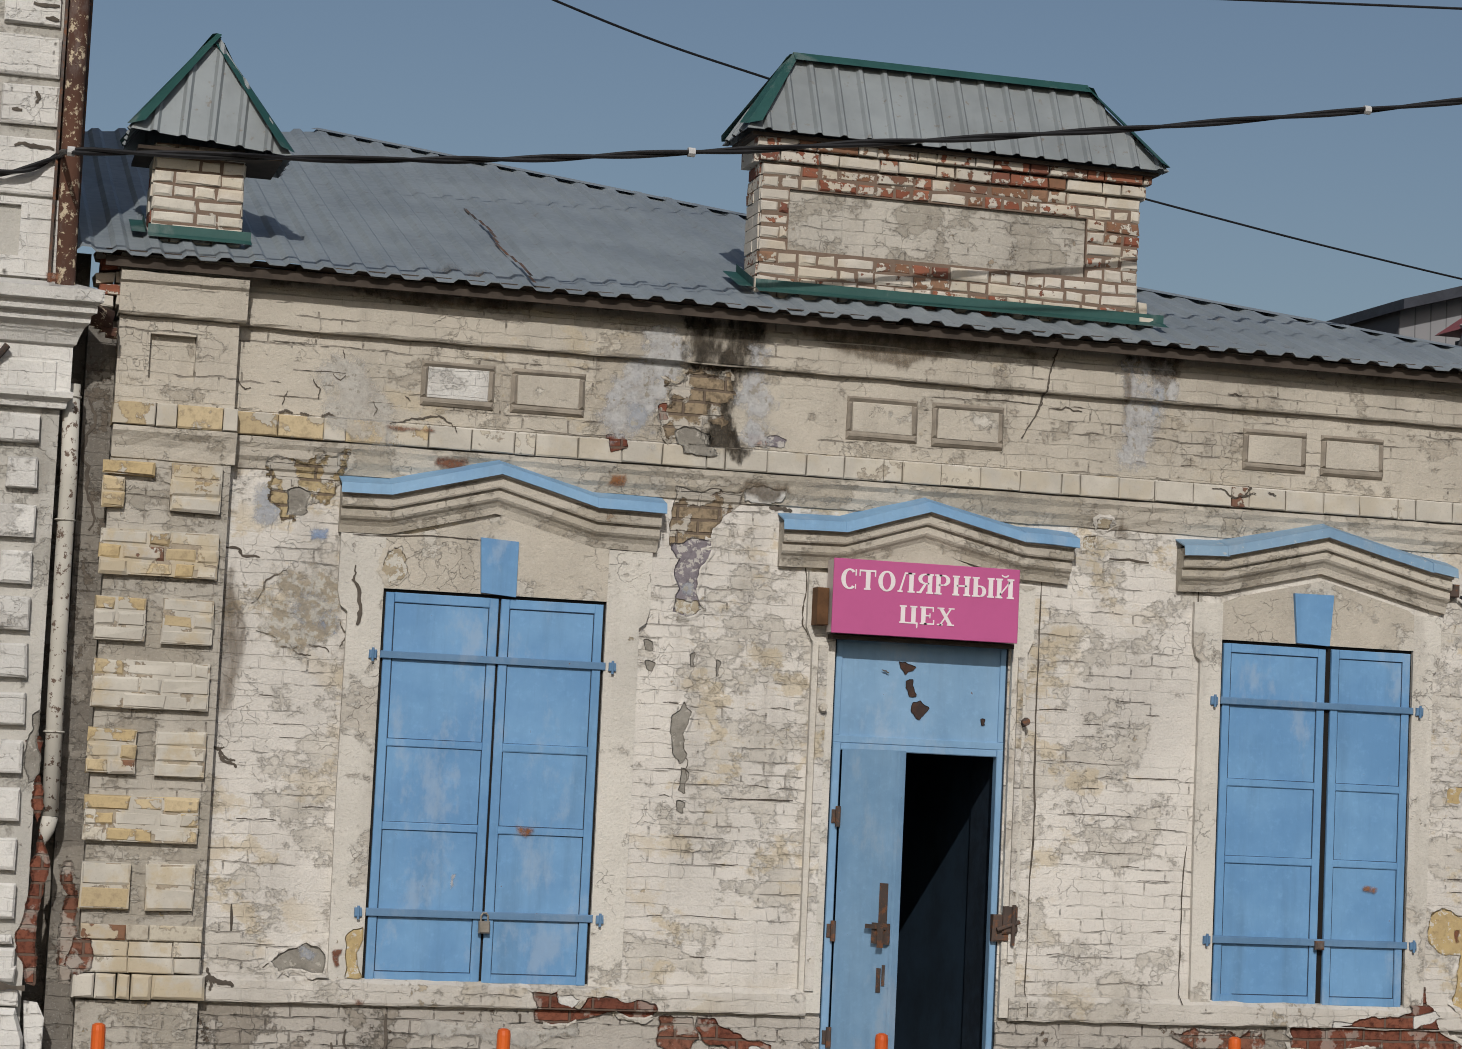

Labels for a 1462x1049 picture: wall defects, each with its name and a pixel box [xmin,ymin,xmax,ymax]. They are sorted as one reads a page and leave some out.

peeling [254,355,395,525]
damp [603,316,772,463]
spalling [652,368,736,456]
damp [744,481,787,501]
crack [1021,349,1082,438]
spalling [663,485,787,621]
peeling [664,697,696,813]
spalling [14,710,94,986]
peeling [262,927,364,980]
spalling [419,987,771,1049]
spalling [1170,1027,1266,1049]
spalling [1285,906,1462,1049]